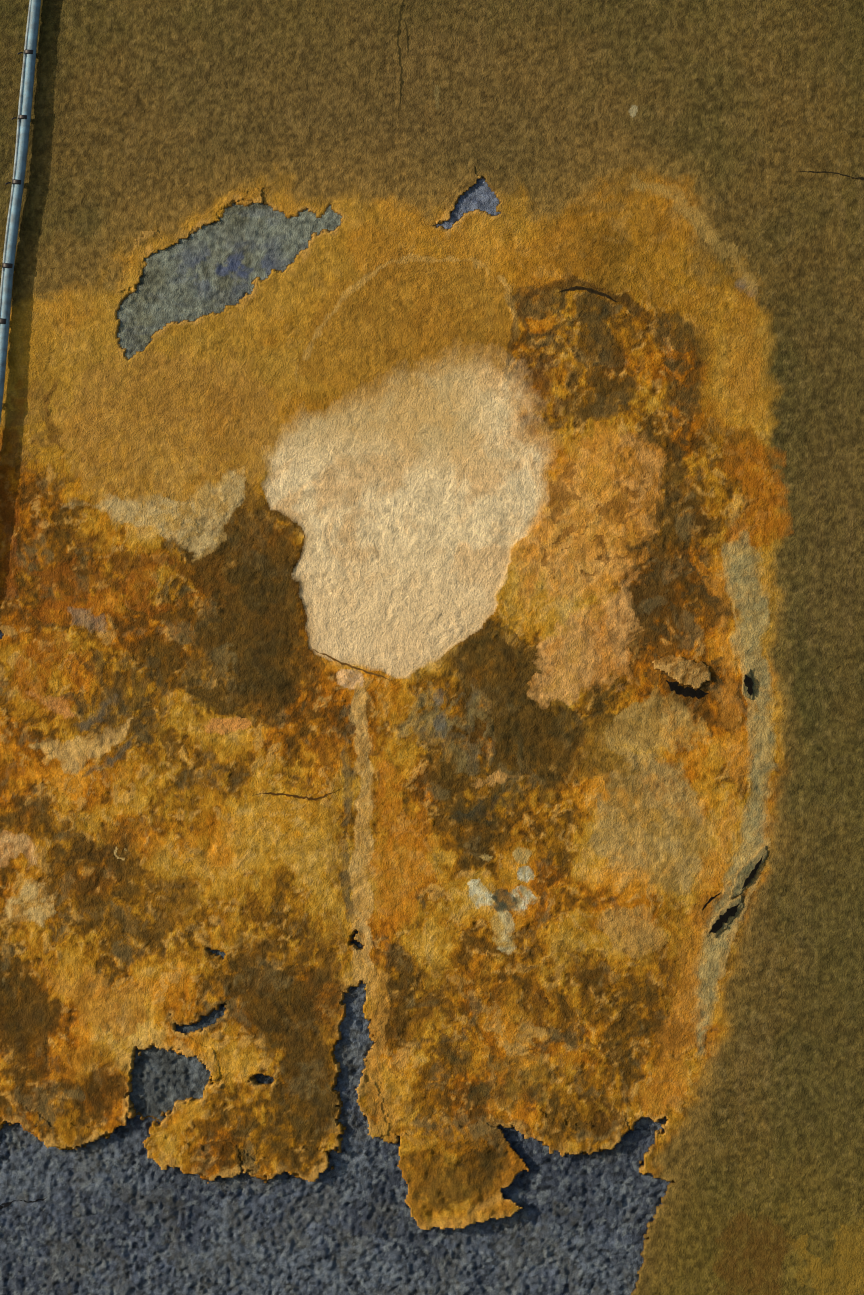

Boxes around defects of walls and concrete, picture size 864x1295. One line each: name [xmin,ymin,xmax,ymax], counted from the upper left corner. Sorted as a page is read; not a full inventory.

flaking render [117,187,342,359]
flaking render [436,166,501,229]
crack [560,286,617,302]
flaking render [630,171,760,294]
crack [795,171,864,180]
flaking render [56,246,714,960]
damp [0,274,758,1149]
crack [666,680,708,699]
crack [744,674,754,696]
flaking render [694,530,781,1061]
crack [702,855,764,934]
flaking render [0,981,670,1295]